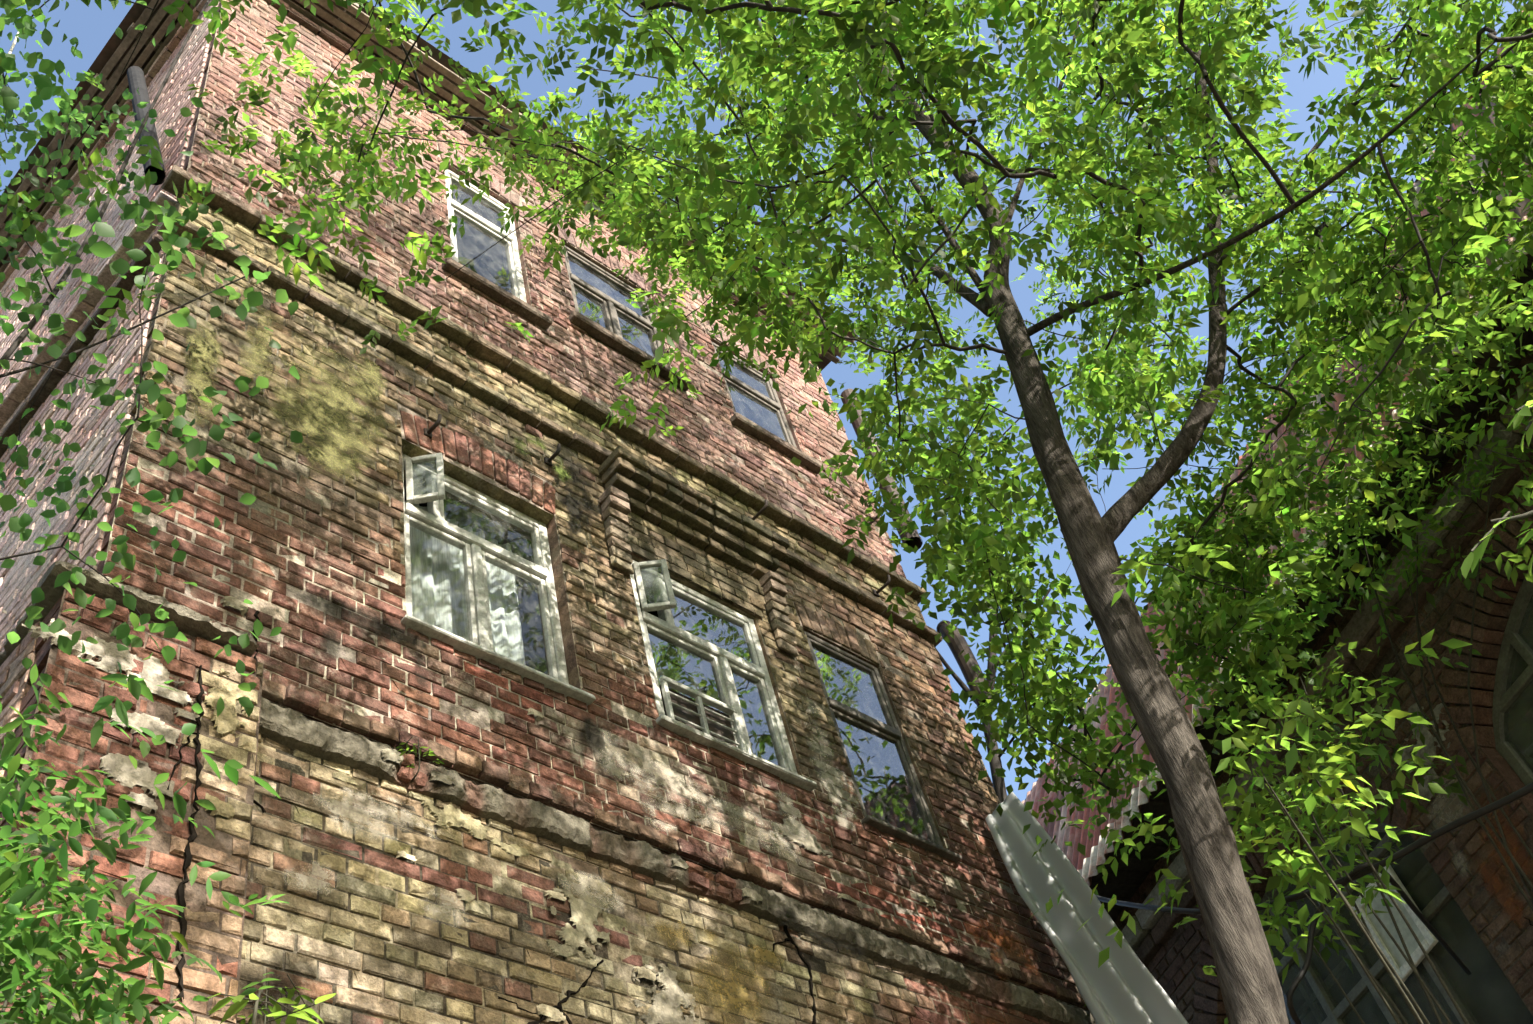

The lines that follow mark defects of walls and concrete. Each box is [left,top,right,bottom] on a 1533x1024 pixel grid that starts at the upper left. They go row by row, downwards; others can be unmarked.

water stain [189,329,220,418]
water stain [244,316,272,376]
water stain [274,354,385,473]
peeling [3,610,246,748]
peeling [99,753,175,814]
crack [167,665,205,1000]
peeling [205,793,235,820]
spalling [301,770,697,1024]
crack [498,960,604,1024]
crack [772,925,816,1024]